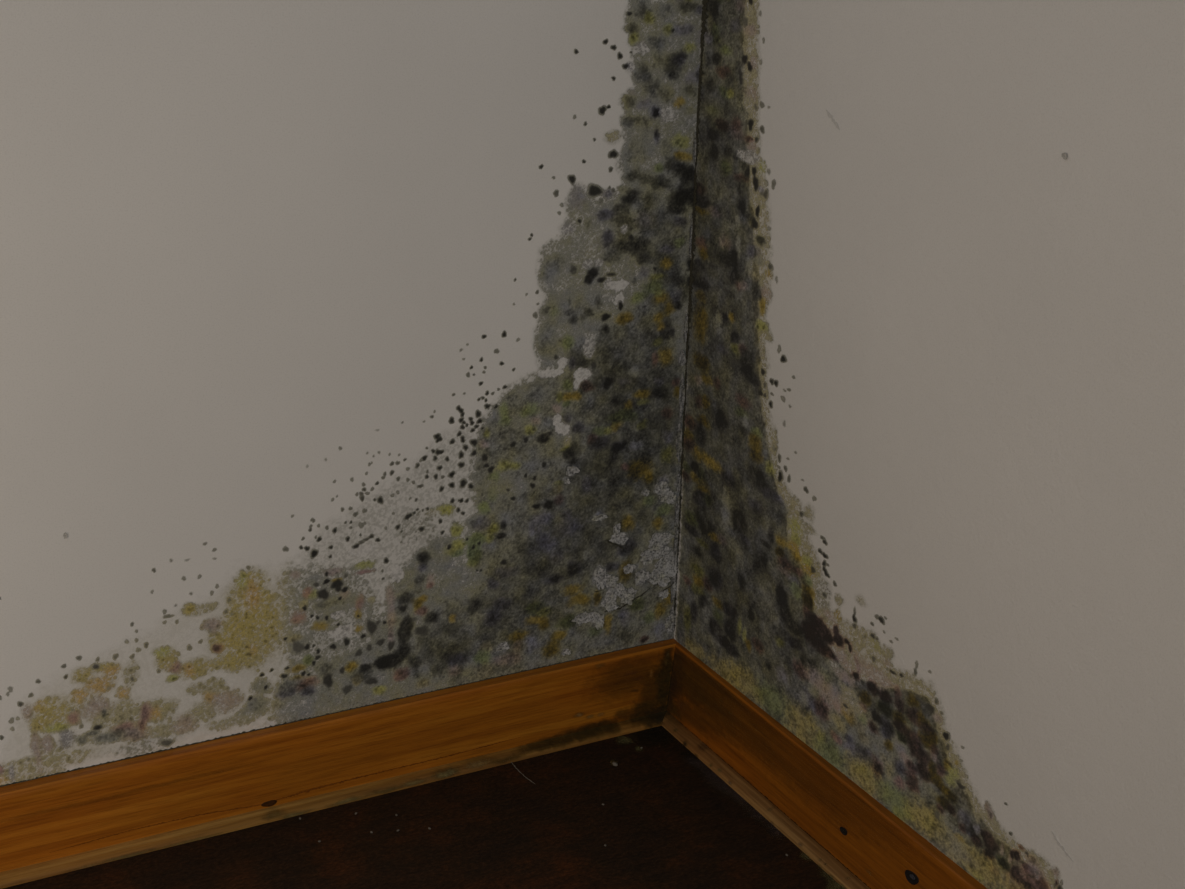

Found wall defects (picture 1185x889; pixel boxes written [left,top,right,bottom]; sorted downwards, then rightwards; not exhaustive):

damp [355,454,424,502]
damp [406,447,449,471]
damp [425,465,455,480]
damp [450,0,1063,889]
damp [308,518,337,542]
damp [341,507,381,549]
damp [403,498,465,532]
damp [0,529,493,785]